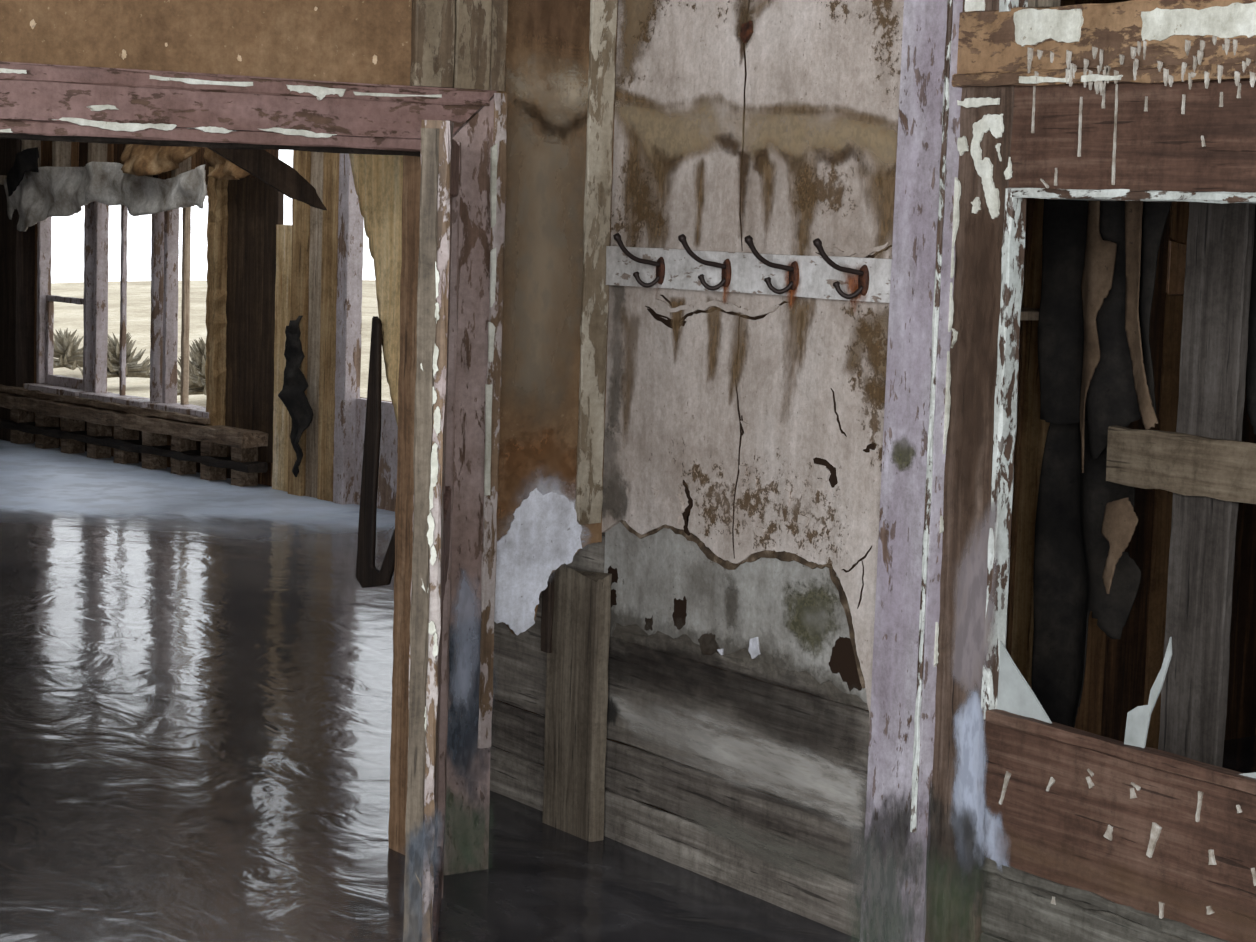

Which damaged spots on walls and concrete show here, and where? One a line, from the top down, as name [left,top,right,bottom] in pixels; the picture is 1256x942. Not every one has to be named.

peeling [1013,8,1084,47]
peeling [1141,2,1256,41]
crack [741,2,749,151]
peeling [58,105,232,133]
damp [611,0,902,258]
damp [708,301,721,378]
damp [729,319,746,398]
damp [787,296,815,379]
crack [676,480,693,536]
crack [732,385,744,559]
peeling [494,471,585,635]
spalling [604,520,867,703]